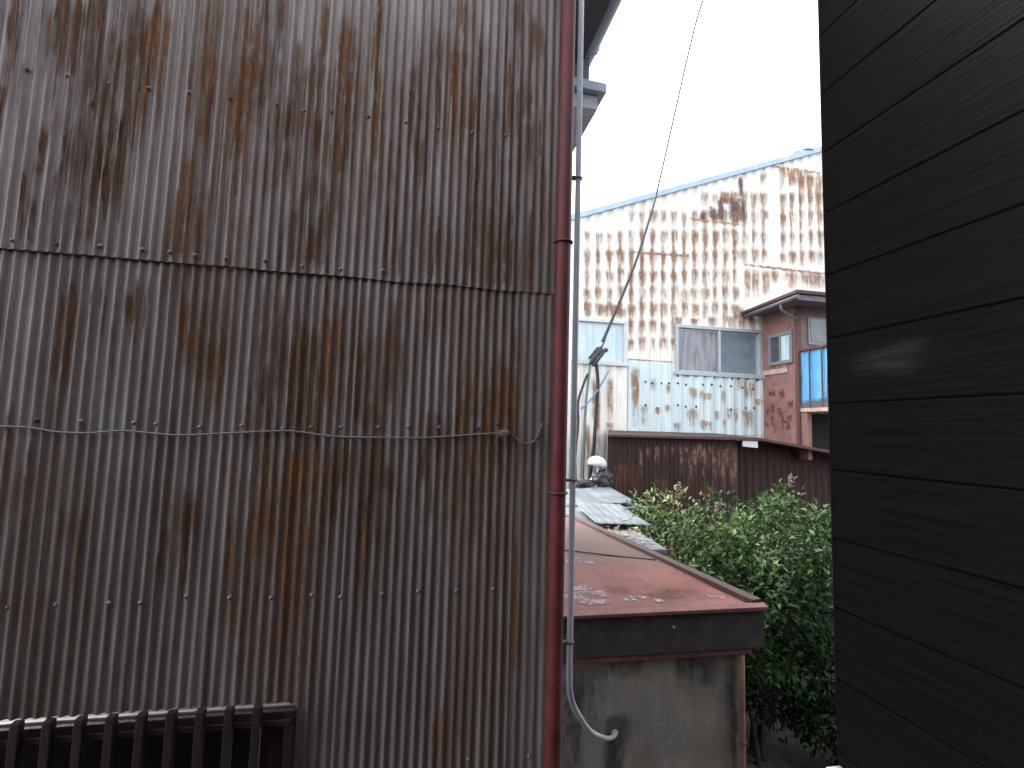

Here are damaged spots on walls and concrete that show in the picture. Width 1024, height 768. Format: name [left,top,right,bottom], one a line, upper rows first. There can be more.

corrosion [0,0,33,113]
corrosion [41,0,169,222]
corrosion [20,123,51,237]
corrosion [166,0,285,404]
corrosion [585,166,825,363]
corrosion [55,287,76,379]
corrosion [219,0,403,698]
corrosion [631,375,668,421]
corrosion [674,381,762,429]
corrosion [153,492,197,598]